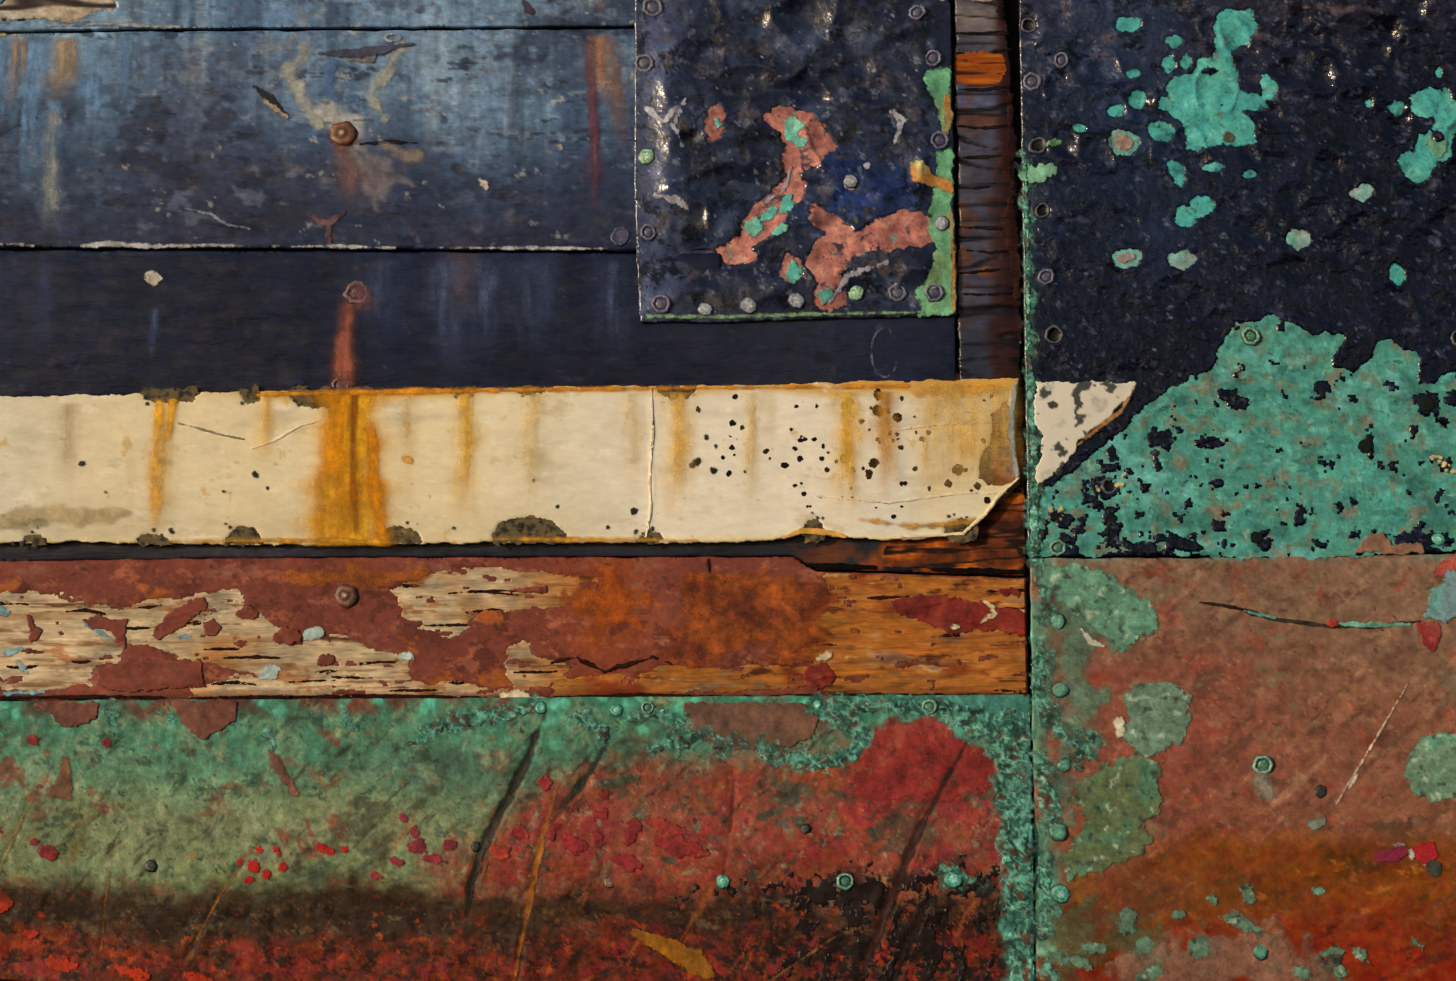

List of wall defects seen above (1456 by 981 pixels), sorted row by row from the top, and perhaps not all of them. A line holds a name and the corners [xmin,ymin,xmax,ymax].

peeling [1107,8,1278,227]
peeling [644,67,957,319]
peeling [1112,249,1142,269]
rust [150,399,177,513]
rust [232,287,820,587]
peeling [0,314,1456,751]
rust [838,384,909,475]
rust [879,382,1026,571]
rust [50,756,73,801]
peeling [851,716,993,812]
peeling [1404,732,1456,803]
rust [631,929,715,980]